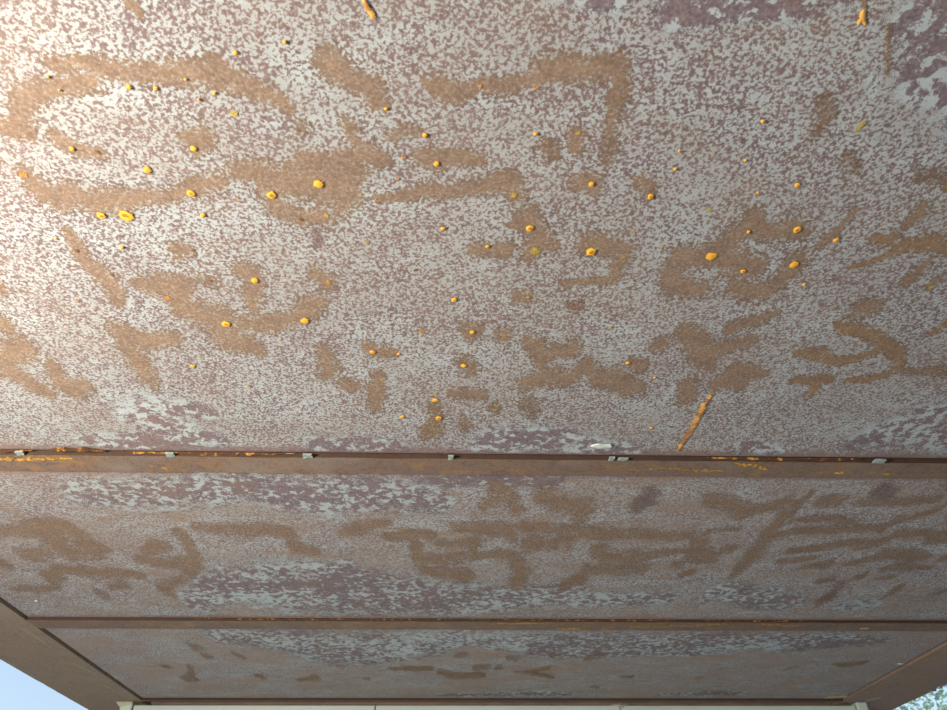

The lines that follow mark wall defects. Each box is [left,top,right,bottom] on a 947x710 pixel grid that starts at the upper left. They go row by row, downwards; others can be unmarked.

rust [362,0,376,20]
rust [856,0,867,26]
rust [0,38,640,402]
rust [417,191,864,452]
rust [0,447,104,461]
rust [627,457,863,474]
rust [0,514,320,602]